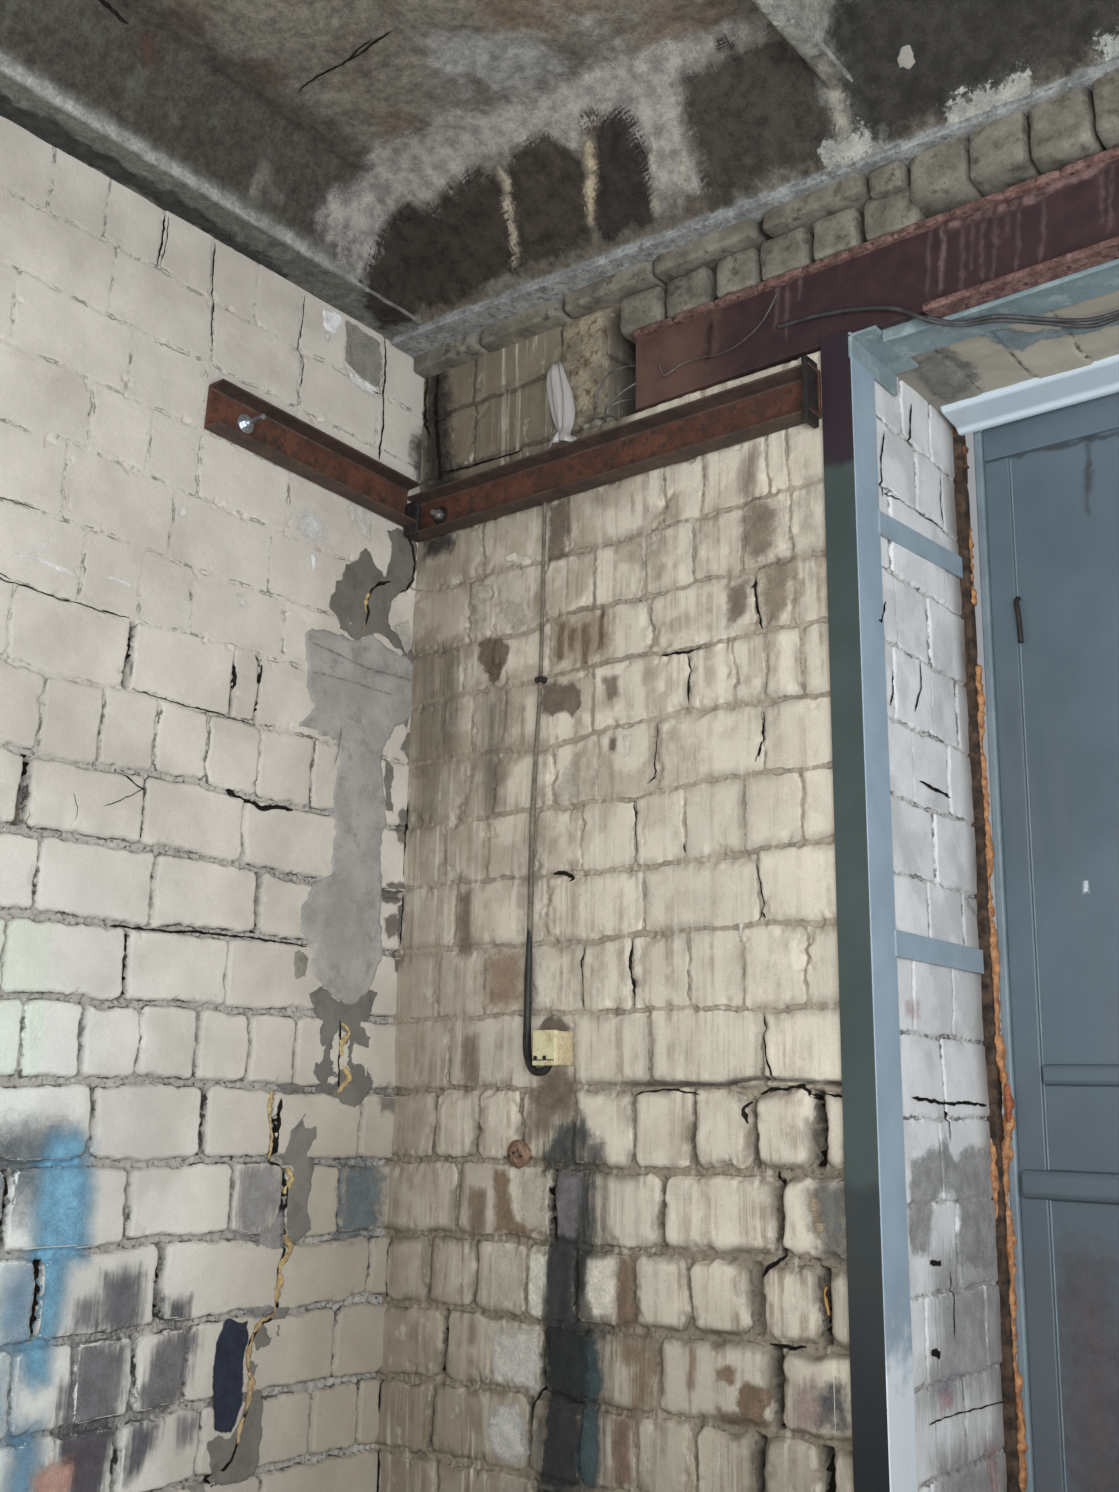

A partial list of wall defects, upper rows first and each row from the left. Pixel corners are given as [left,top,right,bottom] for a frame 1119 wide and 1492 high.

peeling [897,45,915,69]
leakage [315,0,1119,329]
corrosion [927,163,1112,290]
crack [0,573,129,618]
flaking render [329,528,418,663]
peeling [384,716,411,843]
peeling [381,882,406,973]
crack [203,1091,295,1487]
leakage [468,1170,536,1237]
leakage [543,1181,590,1334]
crack [762,1249,788,1277]
leakage [540,1256,656,1487]